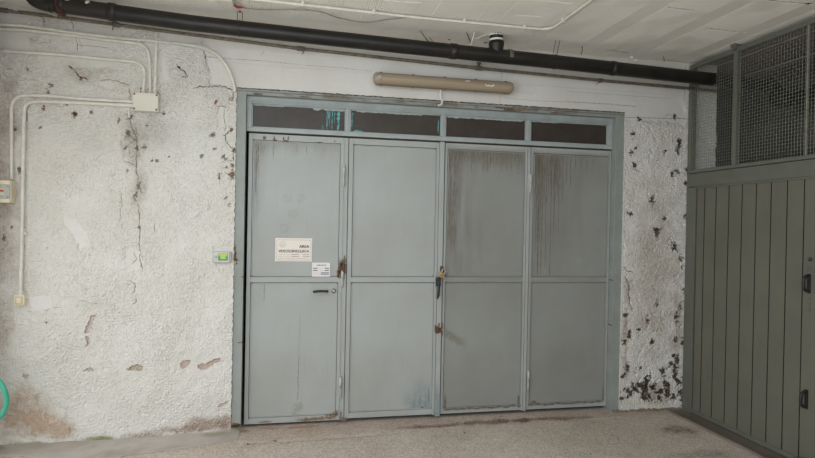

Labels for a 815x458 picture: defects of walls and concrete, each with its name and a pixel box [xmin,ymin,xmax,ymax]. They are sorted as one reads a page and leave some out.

crack [45,120,155,311]
spalling [180,358,220,369]